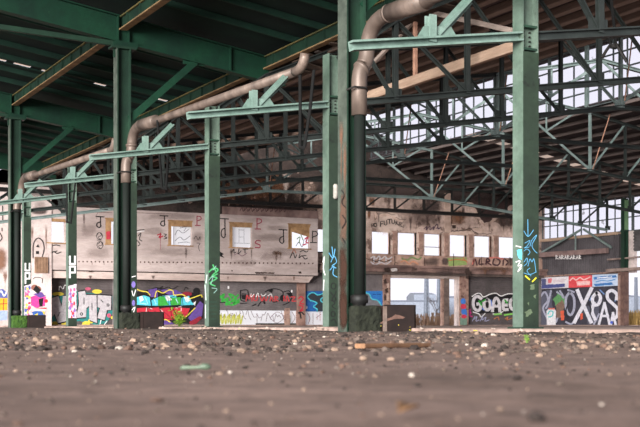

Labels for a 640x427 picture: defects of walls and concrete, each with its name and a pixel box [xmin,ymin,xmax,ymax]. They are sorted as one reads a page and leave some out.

damp [409,199,440,229]
damp [499,213,513,230]
corrosion [339,249,347,327]